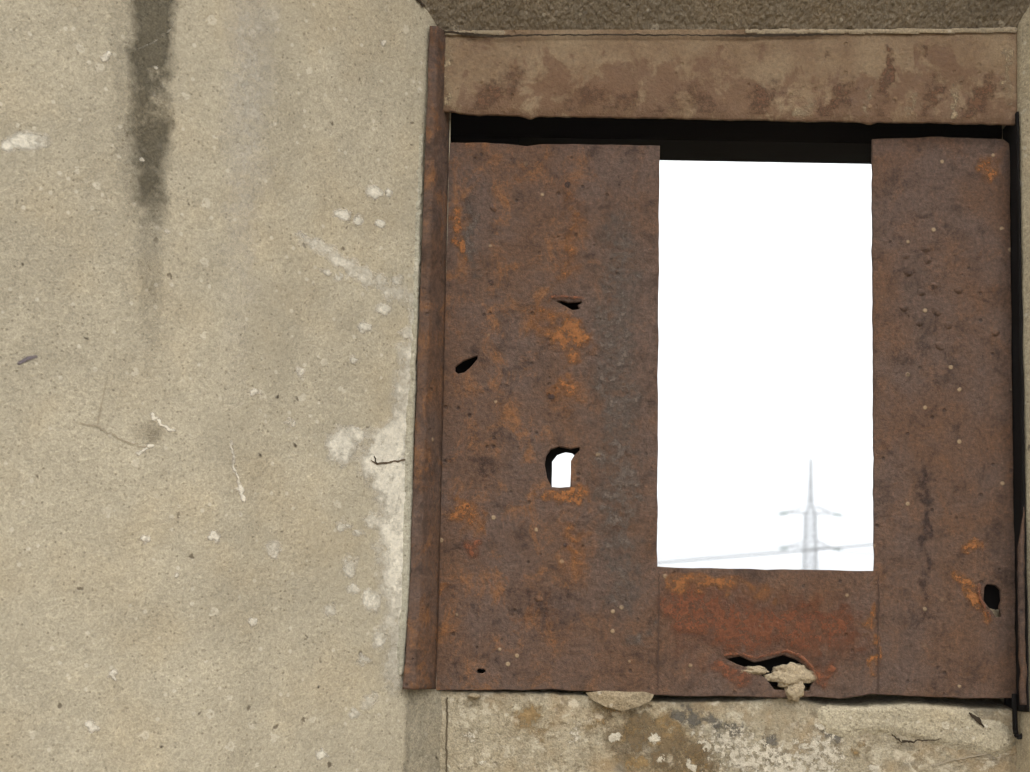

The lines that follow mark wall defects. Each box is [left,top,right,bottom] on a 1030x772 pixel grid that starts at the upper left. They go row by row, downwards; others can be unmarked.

leakage [129,0,174,205]
corrosion [878,45,896,116]
corrosion [530,308,590,396]
crack [75,372,149,448]
corrosion [533,484,588,506]
corrosion [666,573,775,602]
corrosion [952,572,990,622]
peeling [740,666,769,675]
peeling [784,681,805,702]
leakage [648,733,668,762]
leakage [686,716,848,772]